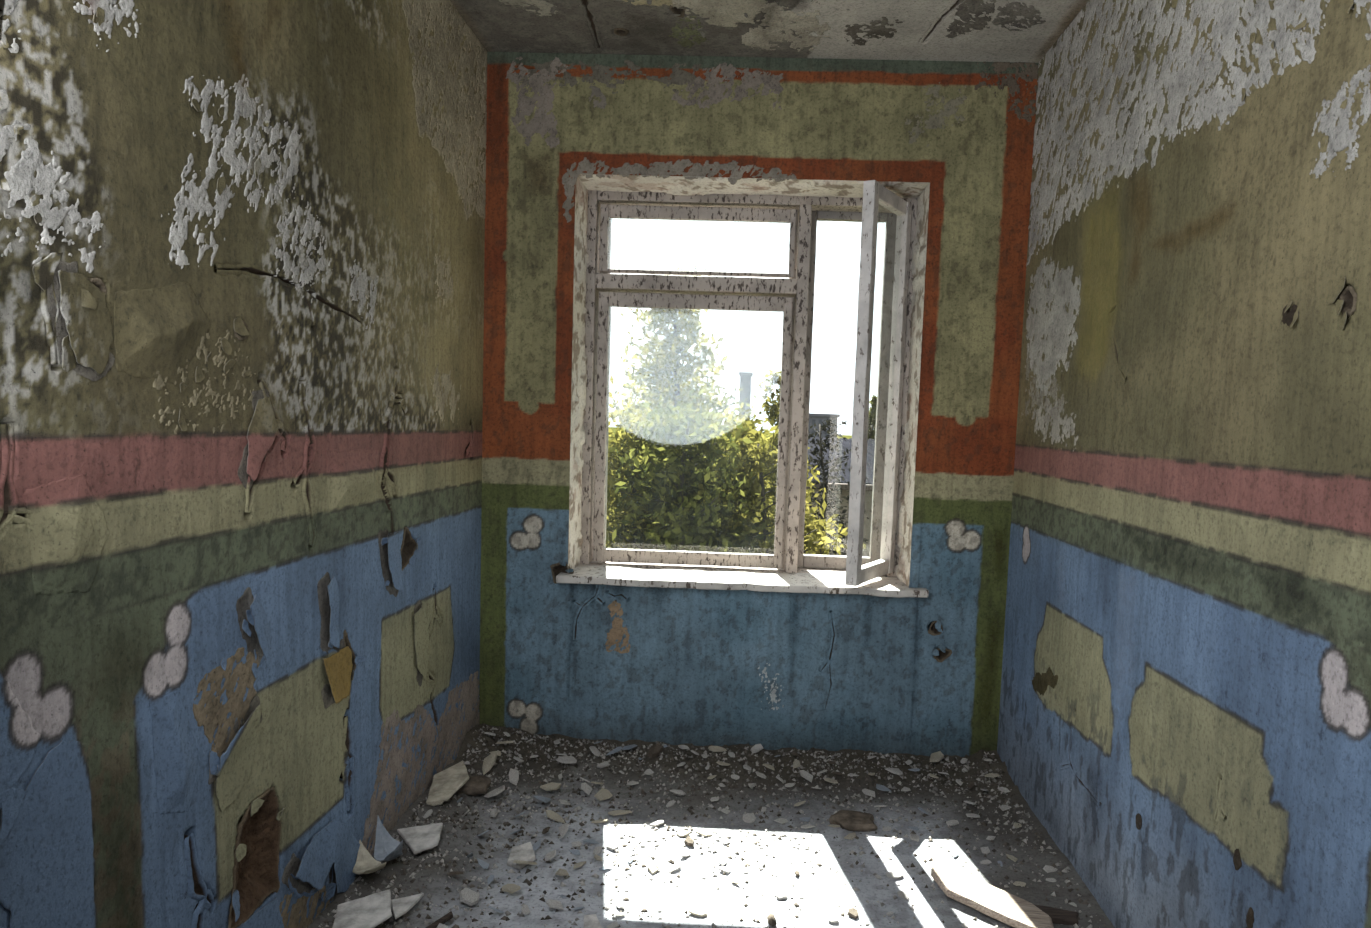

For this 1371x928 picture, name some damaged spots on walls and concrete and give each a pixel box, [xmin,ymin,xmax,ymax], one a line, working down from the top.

peeling [73,0,141,52]
peeling [613,0,903,52]
peeling [0,90,115,382]
peeling [161,74,379,329]
peeling [974,0,1371,451]
crack [0,423,34,536]
crack [244,378,316,546]
crack [377,371,407,535]
crack [426,588,441,737]
peeling [0,669,97,928]
flaking render [193,572,480,928]
crack [340,716,356,811]